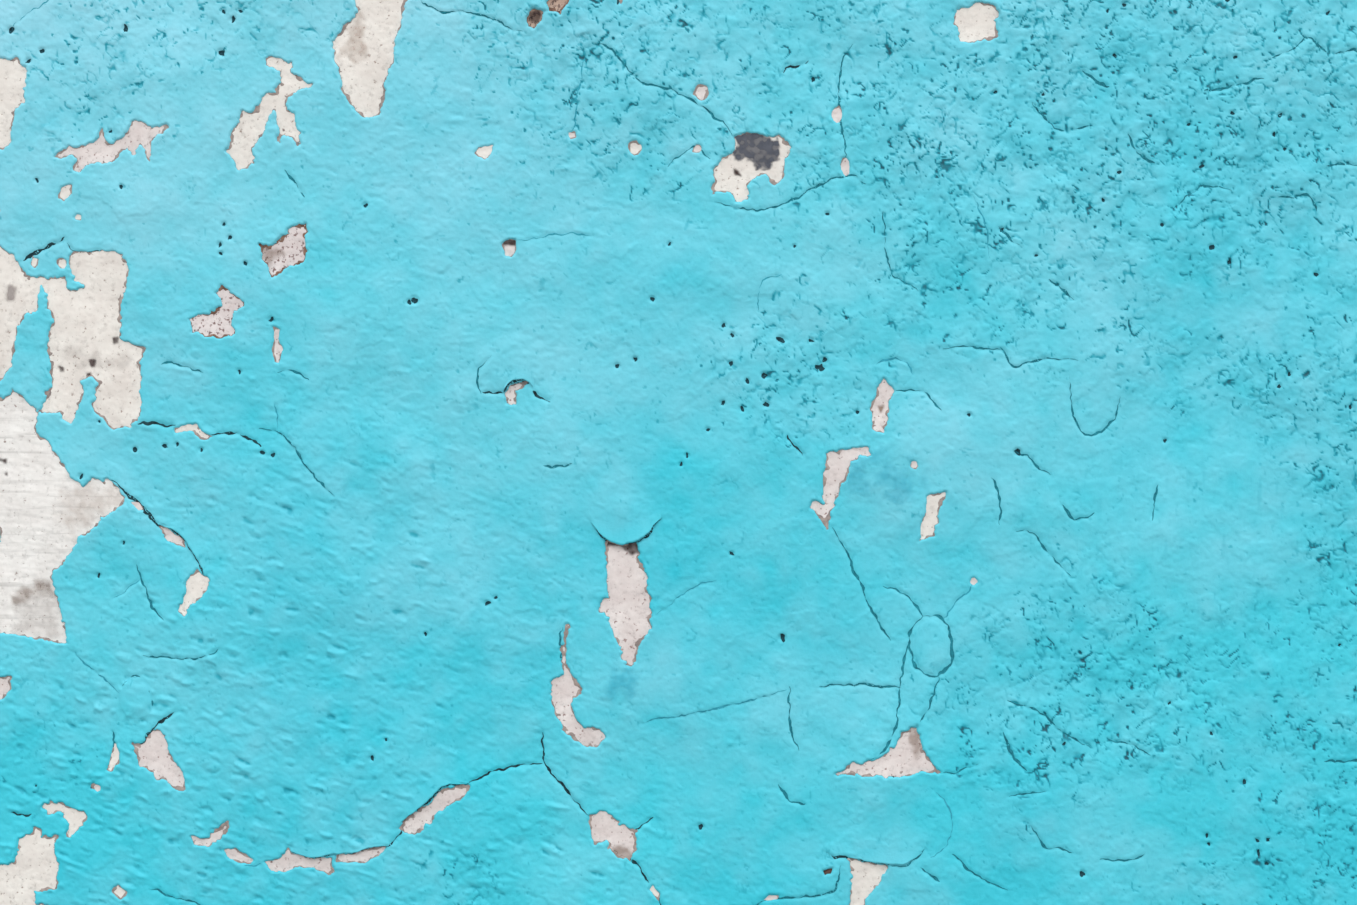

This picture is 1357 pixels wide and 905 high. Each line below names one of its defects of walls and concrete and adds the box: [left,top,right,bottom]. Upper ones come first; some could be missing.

peeling [226,56,312,170]
peeling [332,0,408,118]
peeling [711,132,791,202]
peeling [0,246,146,643]
crack [596,519,661,544]
peeling [591,513,662,666]
crack [645,527,972,761]
crack [1003,700,1149,797]
peeling [0,801,87,905]
crack [630,817,661,905]
crack [757,766,1007,905]
crack [1031,826,1072,853]